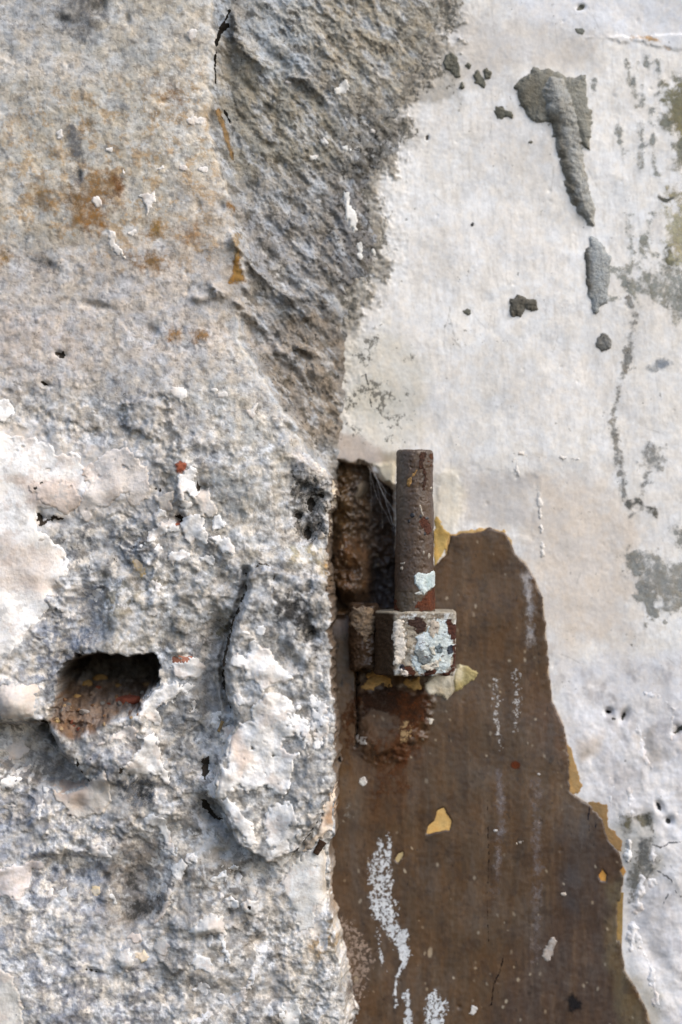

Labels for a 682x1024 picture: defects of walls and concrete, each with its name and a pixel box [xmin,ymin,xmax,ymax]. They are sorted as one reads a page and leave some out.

crack [214,9,231,84]
peeling [216,109,234,160]
corrosion [419,452,434,491]
corrosion [419,517,432,535]
crack [222,562,275,709]
corrosion [408,588,436,634]
peeling [0,740,32,791]
peeling [36,655,207,821]
corrosion [342,619,457,794]
peeling [205,462,651,1024]